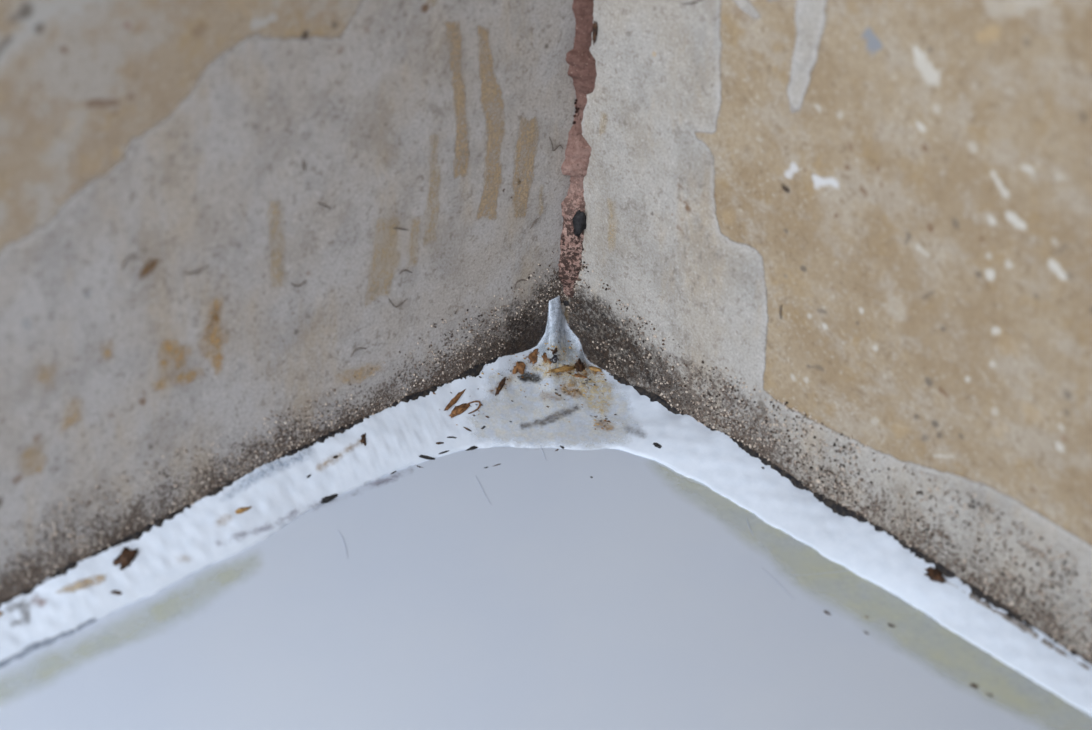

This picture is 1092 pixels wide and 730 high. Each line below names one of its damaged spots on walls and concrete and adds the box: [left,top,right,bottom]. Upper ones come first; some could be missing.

peeling [0,0,576,597]
leakage [446,22,469,177]
leakage [477,27,538,219]
leakage [0,248,1092,664]
peeling [568,0,1092,662]
leakage [764,529,1064,713]